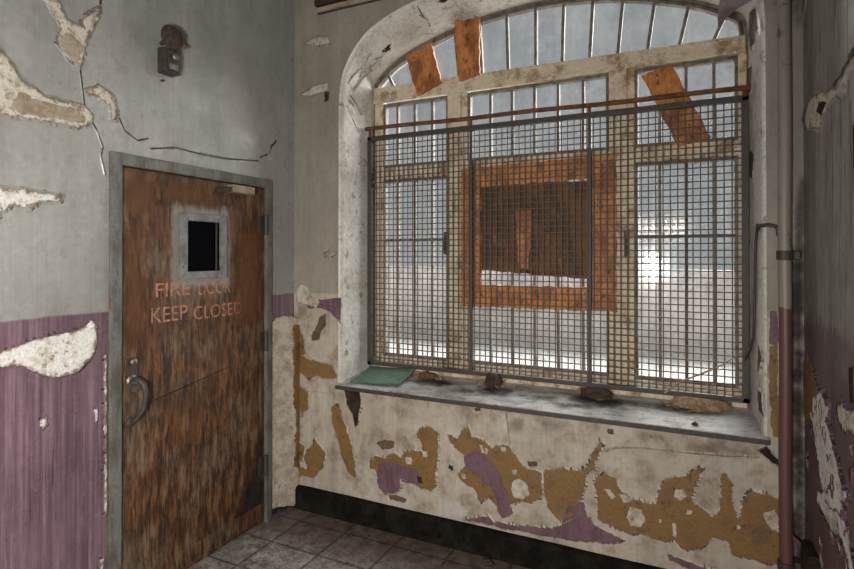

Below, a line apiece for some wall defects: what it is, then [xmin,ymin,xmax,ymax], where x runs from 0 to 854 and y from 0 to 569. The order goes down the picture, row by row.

peeling [43,0,103,70]
peeling [717,0,758,53]
peeling [0,47,120,130]
peeling [802,46,854,133]
peeling [0,186,66,223]
peeling [296,283,341,323]
peeling [0,319,108,518]
flaking render [344,390,363,428]
peeling [756,344,764,417]
flaking render [757,446,778,467]
peeling [803,350,854,569]